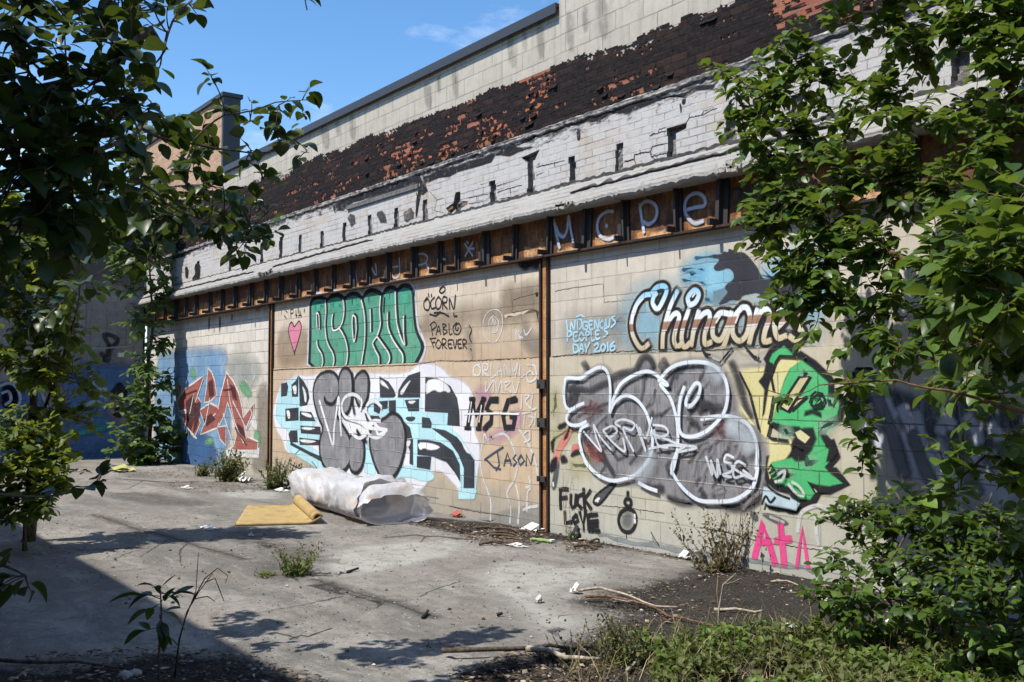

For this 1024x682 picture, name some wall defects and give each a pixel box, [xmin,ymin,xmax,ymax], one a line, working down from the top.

crack [865,76,988,106]
peeling [147,0,883,260]
crack [141,107,841,299]
corrosion [594,227,618,246]
corrosion [637,230,671,239]
corrosion [285,264,408,300]
corrosion [524,229,576,486]